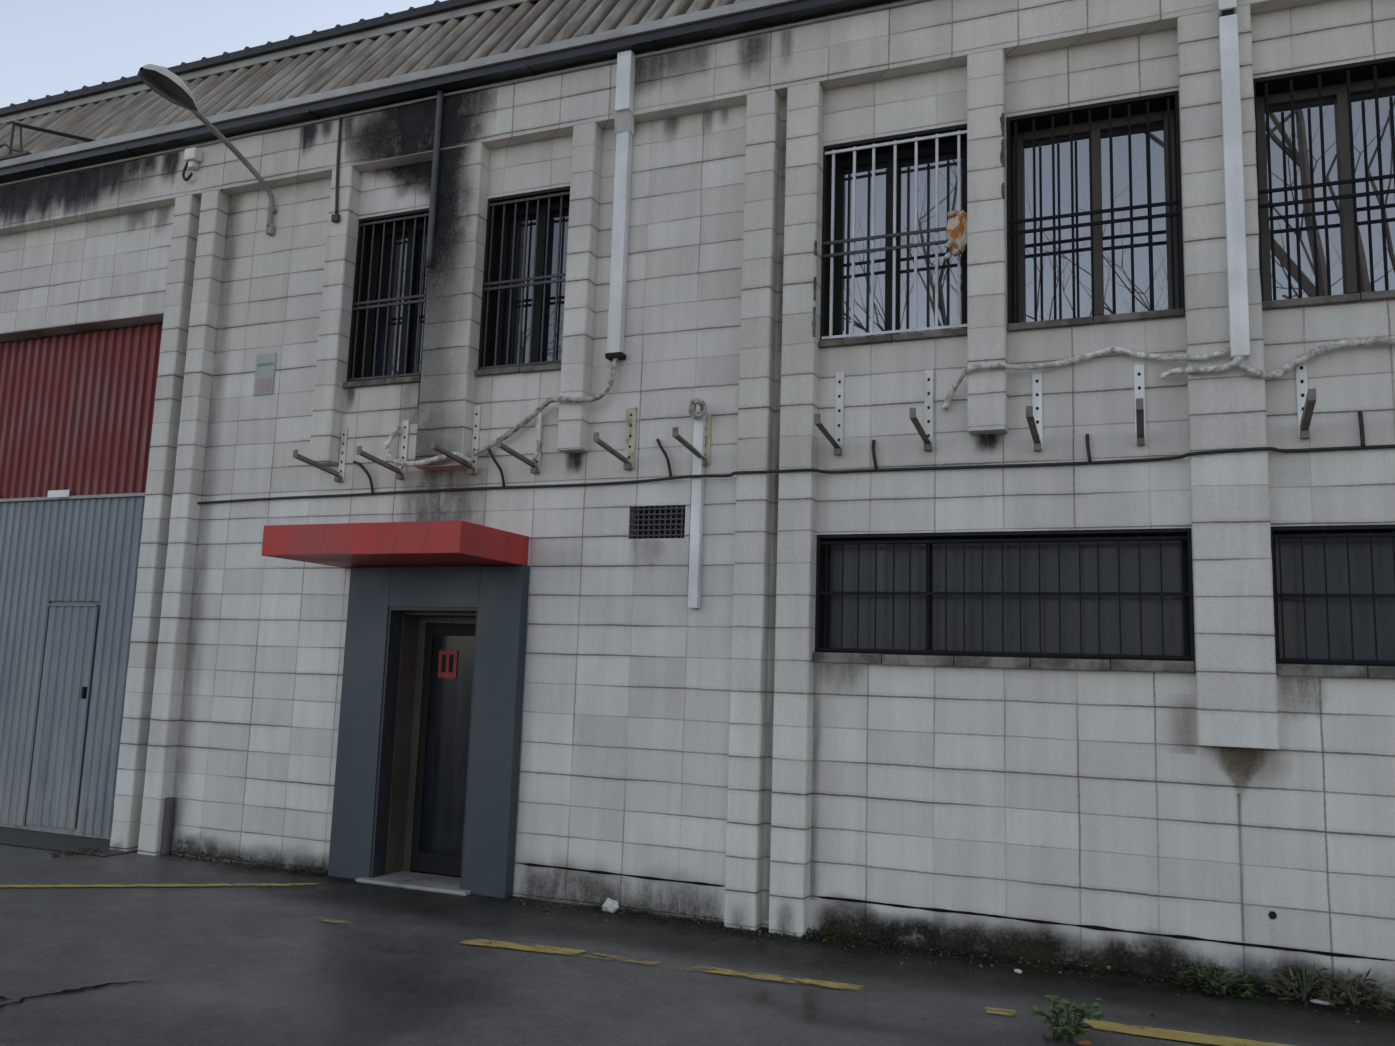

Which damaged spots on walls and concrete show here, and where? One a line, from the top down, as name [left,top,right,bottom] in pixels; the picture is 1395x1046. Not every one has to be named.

water stain [302,117,351,149]
water stain [0,152,179,219]
water stain [376,145,468,407]
crack [0,980,154,1008]
water stain [612,911,1395,1043]